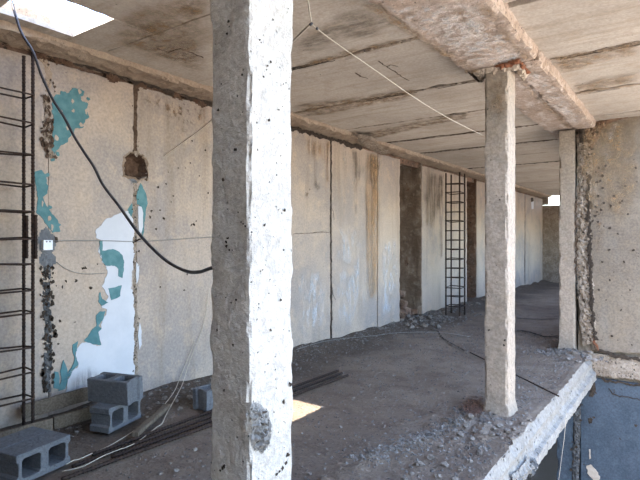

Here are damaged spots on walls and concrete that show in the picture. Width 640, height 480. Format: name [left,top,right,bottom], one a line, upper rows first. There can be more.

peeling [39,58,90,161]
crack [1,41,213,108]
crack [515,124,558,144]
peeling [35,170,61,243]
flaking render [39,85,165,393]
crack [291,36,485,338]
spalling [575,117,628,346]
spalling [242,402,272,453]
spalling [512,456,538,480]
spalling [570,404,600,480]